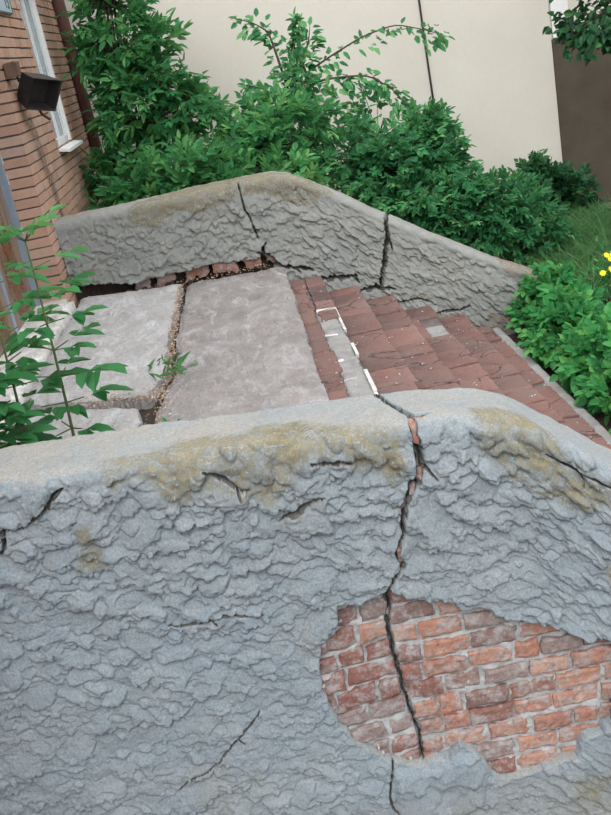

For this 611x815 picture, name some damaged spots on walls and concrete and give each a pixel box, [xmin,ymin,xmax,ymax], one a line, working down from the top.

crack [237,184,470,313]
crack [0,488,62,555]
crack [374,394,438,590]
spalling [319,589,611,773]
crack [180,710,260,790]
crack [389,760,400,815]